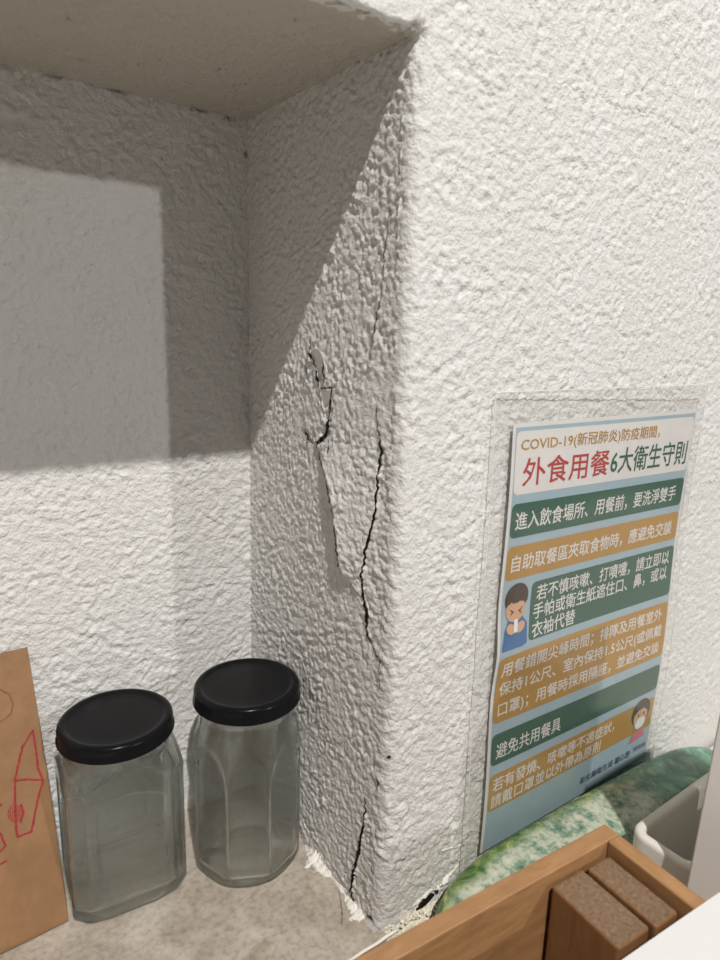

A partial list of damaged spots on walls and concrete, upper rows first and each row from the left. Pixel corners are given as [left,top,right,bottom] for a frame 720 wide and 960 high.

peeling [303,341,333,448]
crack [359,405,385,688]
crack [349,778,379,921]
spalling [304,844,459,941]